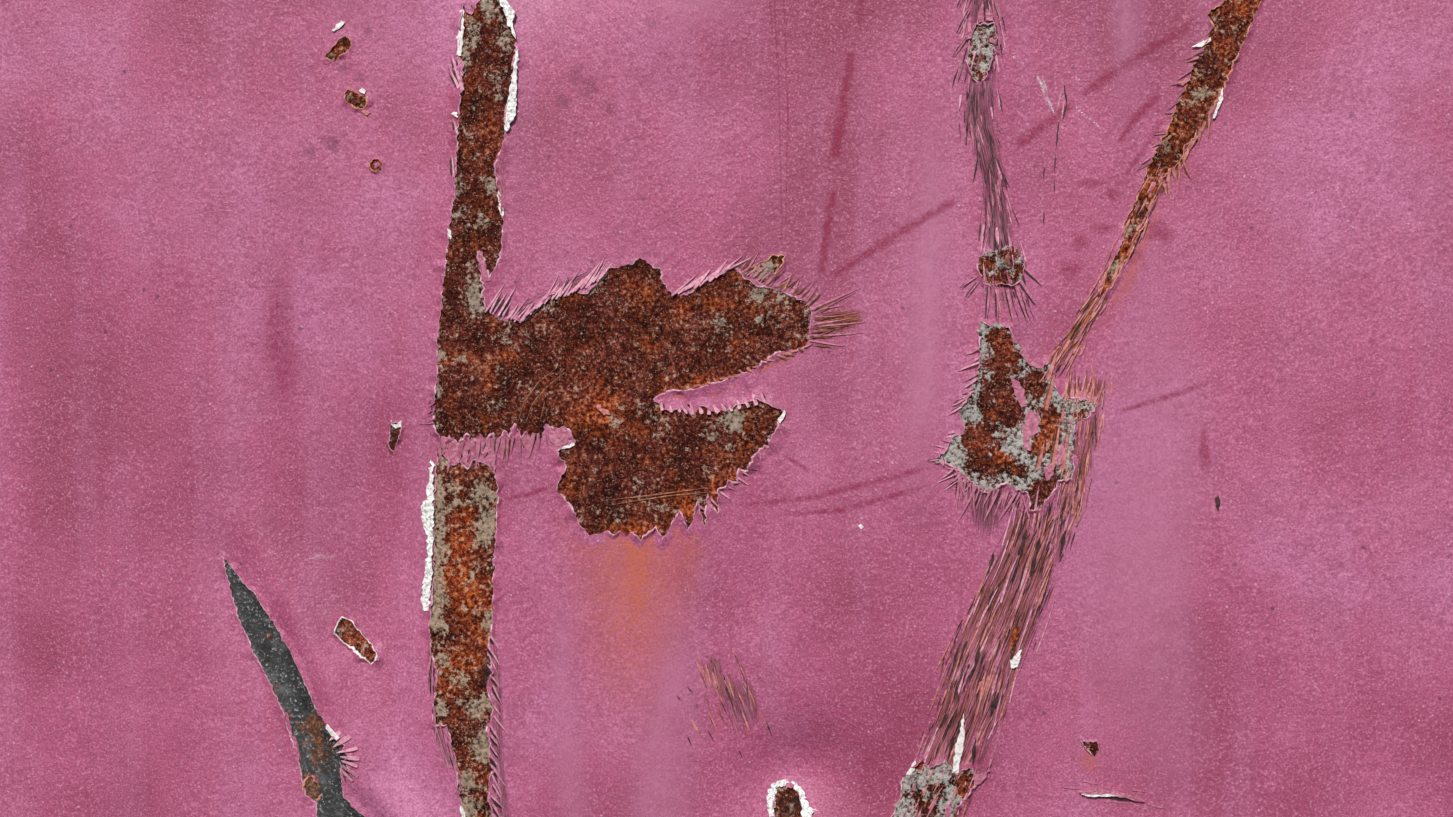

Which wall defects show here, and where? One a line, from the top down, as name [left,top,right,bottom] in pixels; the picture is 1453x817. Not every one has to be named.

rust [417,0,866,817]
rust [929,317,1113,538]
spalling [216,550,375,817]
peeling [330,613,386,671]